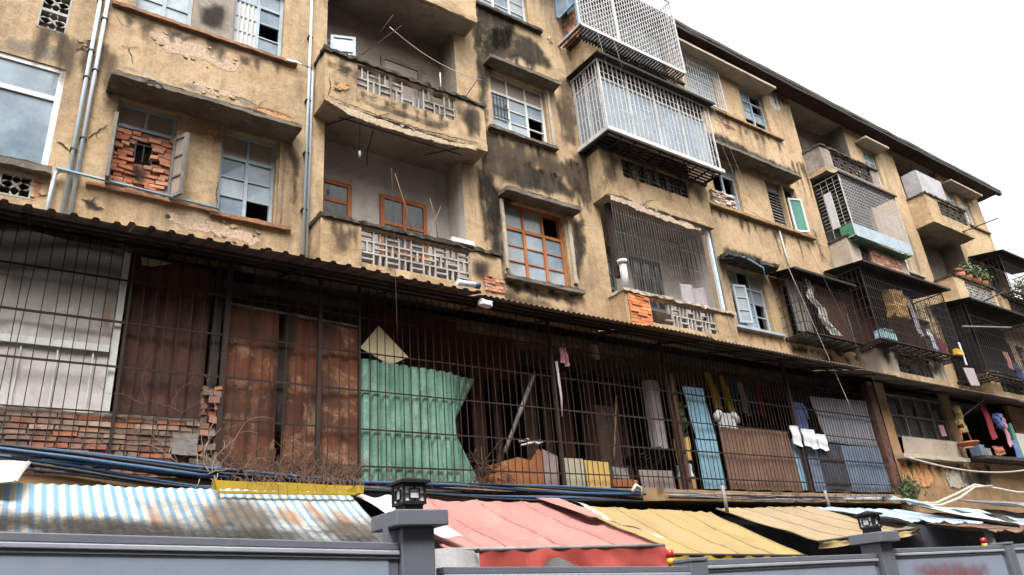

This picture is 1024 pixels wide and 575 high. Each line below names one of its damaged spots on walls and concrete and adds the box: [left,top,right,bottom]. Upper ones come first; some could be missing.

flaking render [148,29,242,72]
water stain [202,6,224,58]
flaking render [186,80,297,122]
flaking render [330,80,477,150]
water stain [361,9,592,312]
flaking render [167,211,261,246]
corrosion [112,255,213,420]
corrosion [219,304,458,479]